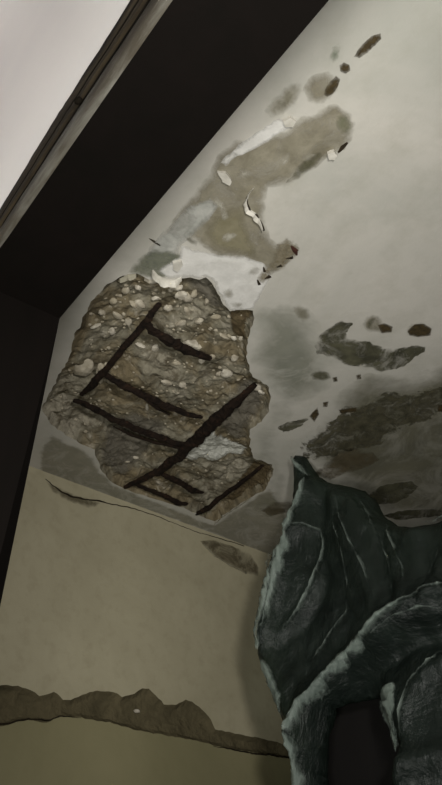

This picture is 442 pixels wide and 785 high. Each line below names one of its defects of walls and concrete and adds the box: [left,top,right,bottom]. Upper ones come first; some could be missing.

peeling [309,77,332,99]
water stain [222,120,290,164]
peeling [172,108,350,285]
water stain [135,201,269,310]
water stain [320,322,425,379]
spalling [41,260,274,521]
water stain [278,401,329,432]
water stain [300,383,442,520]
peeling [203,541,257,574]
spalling [0,685,290,759]